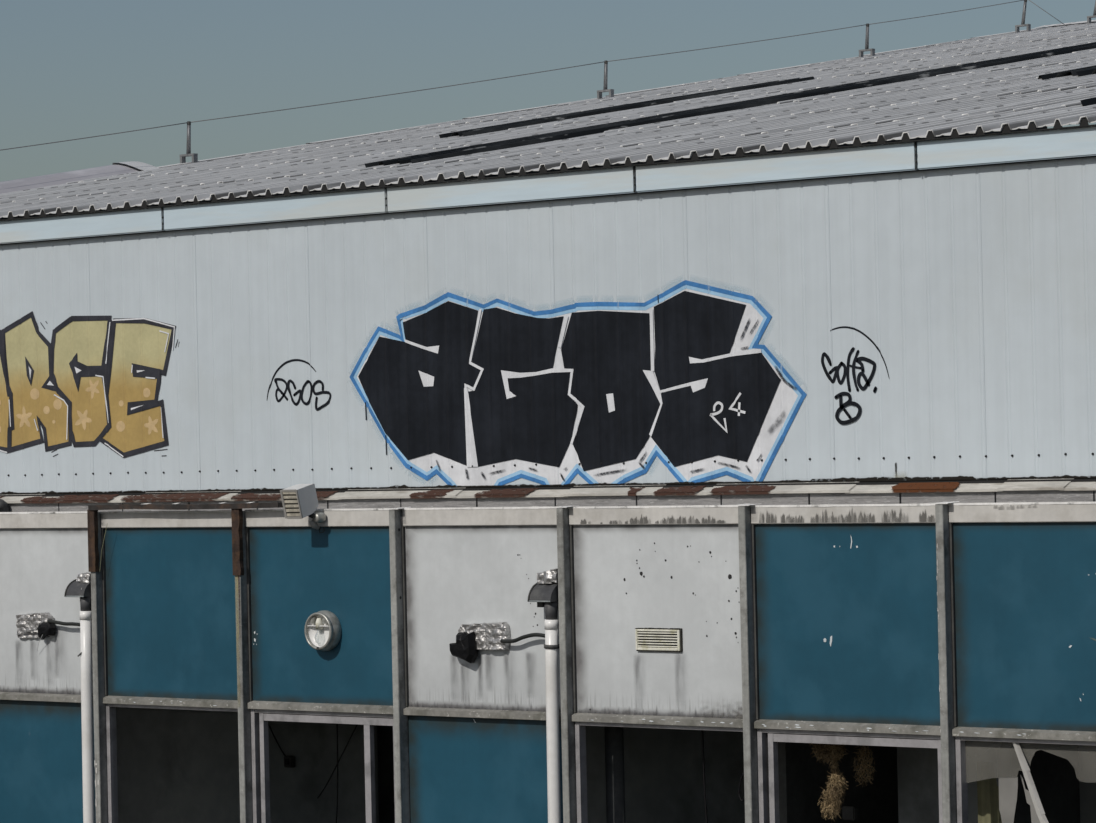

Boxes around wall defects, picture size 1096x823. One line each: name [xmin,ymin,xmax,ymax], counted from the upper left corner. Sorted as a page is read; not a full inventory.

rust [315,463,1096,500]
rust [0,488,283,504]
water stain [600,515,724,524]
water stain [759,511,902,523]